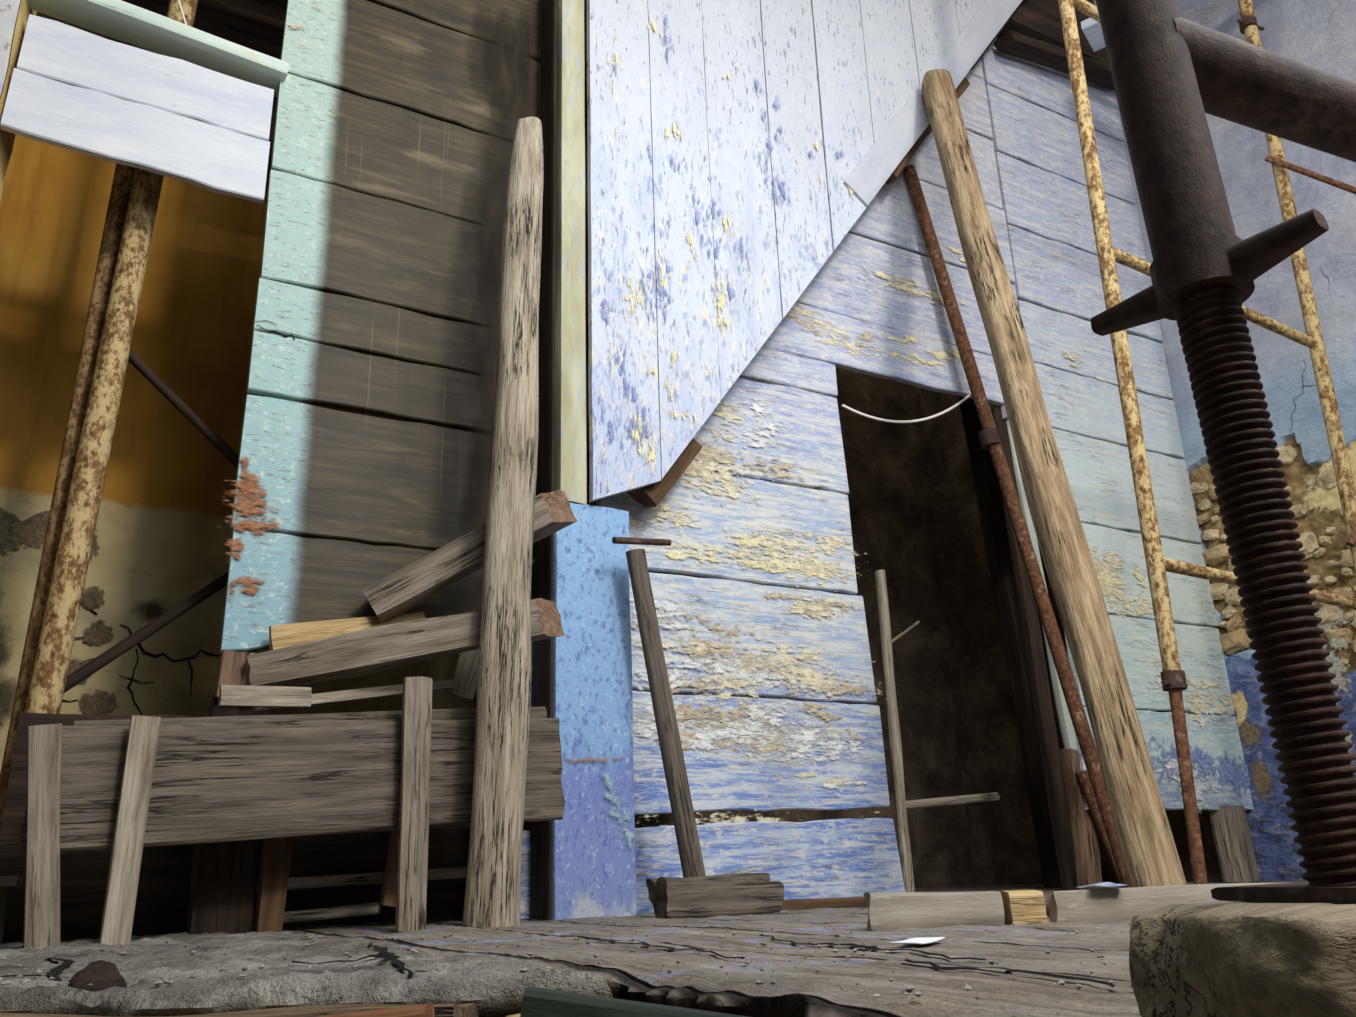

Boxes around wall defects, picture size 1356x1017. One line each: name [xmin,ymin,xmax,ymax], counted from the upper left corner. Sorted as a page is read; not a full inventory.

peeling [754,79,791,208]
peeling [687,193,751,330]
peeling [785,305,975,370]
peeling [863,266,946,311]
peeling [602,249,867,620]
spalling [1189,461,1253,656]
spalling [1275,437,1356,705]
damp [0,631,8,663]
crack [74,604,221,715]
peeling [630,598,659,743]
peeling [653,597,895,791]
peeling [695,801,780,824]